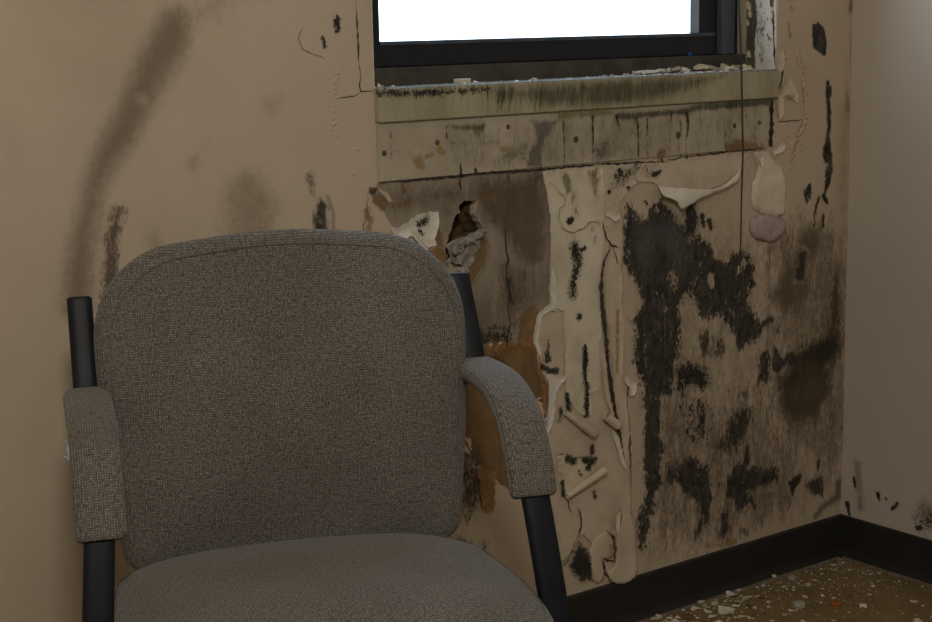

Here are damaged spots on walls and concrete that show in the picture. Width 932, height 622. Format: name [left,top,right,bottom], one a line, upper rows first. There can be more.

water stain [100,208,128,297]
water stain [313,195,335,230]
water stain [615,98,771,159]
water stain [775,80,833,306]
peeling [363,151,750,582]
water stain [623,196,851,551]